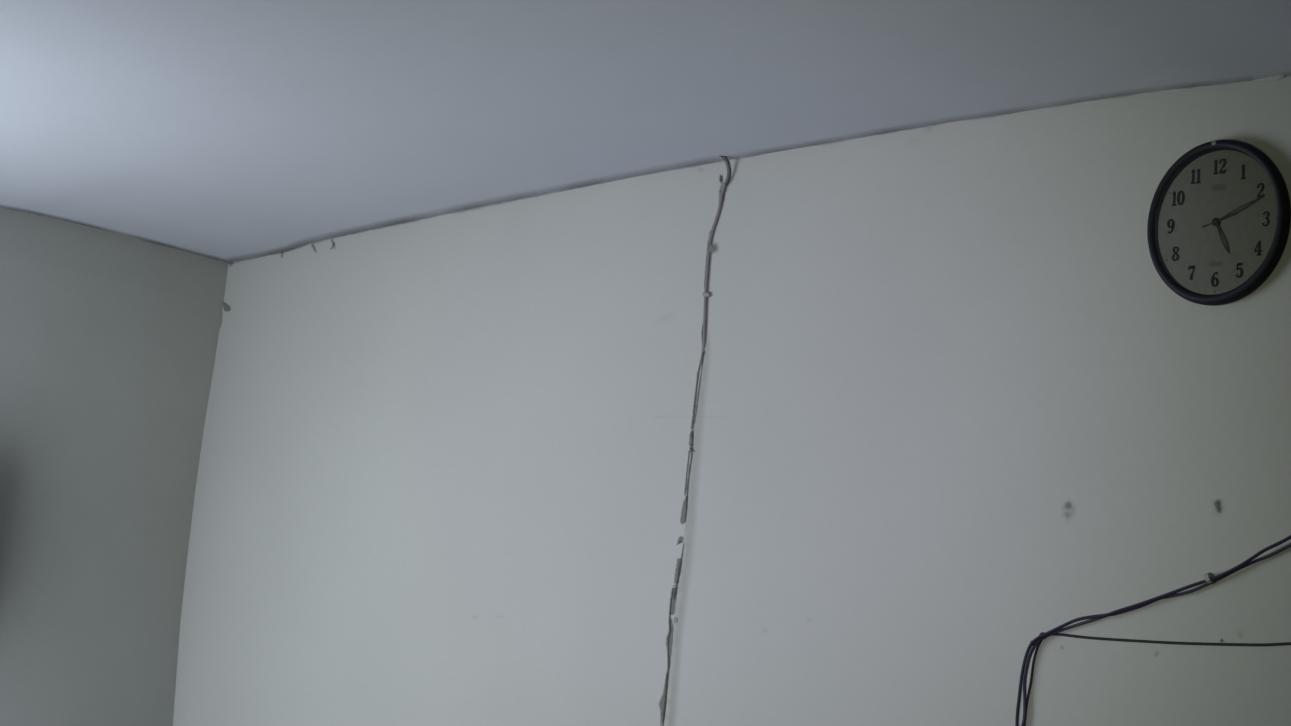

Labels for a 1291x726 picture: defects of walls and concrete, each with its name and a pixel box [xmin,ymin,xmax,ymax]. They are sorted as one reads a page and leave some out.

crack [659,231,714,726]